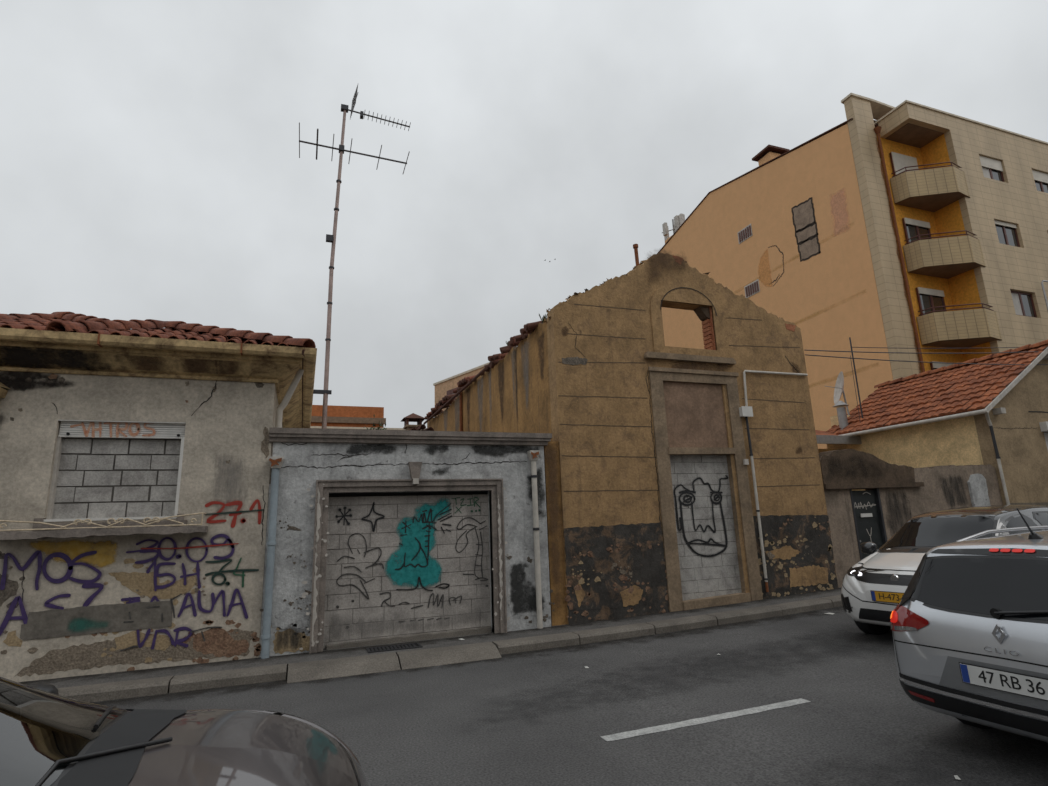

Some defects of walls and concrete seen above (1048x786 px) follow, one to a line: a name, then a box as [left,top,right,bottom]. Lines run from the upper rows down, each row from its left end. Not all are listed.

flaking render [0,484,329,678]
peeling [492,487,669,623]
peeling [758,517,836,597]